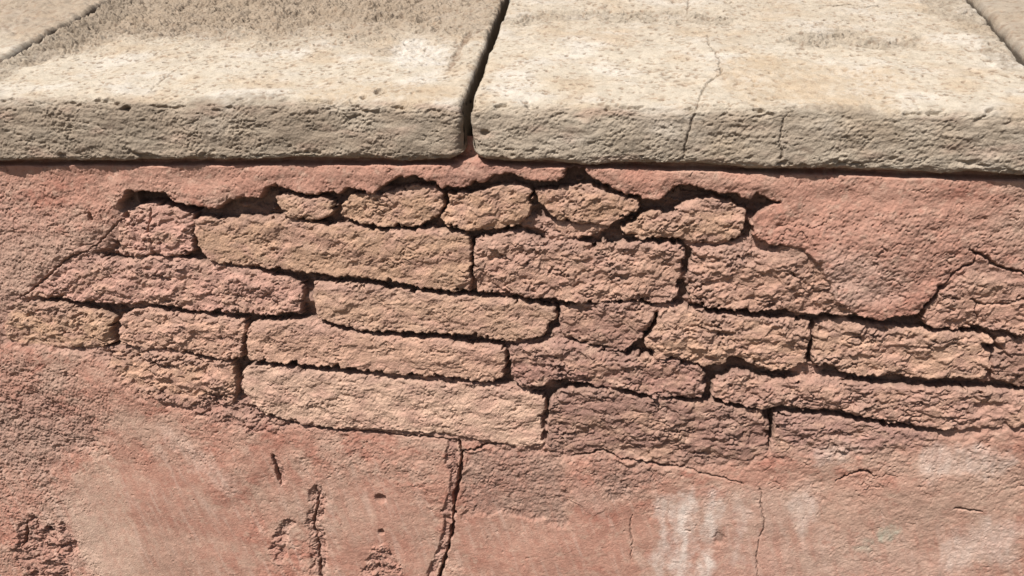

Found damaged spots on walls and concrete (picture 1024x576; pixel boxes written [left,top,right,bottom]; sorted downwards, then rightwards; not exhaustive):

crack [706,35,721,60]
crack [681,112,698,161]
crack [777,125,785,165]
spalling [200,183,290,217]
spalling [471,166,618,240]
spalling [207,266,418,322]
spalling [574,184,781,352]
spalling [155,345,313,436]
spalling [326,297,771,531]
spalling [703,308,1012,395]
crack [268,453,331,576]
crack [291,420,499,576]